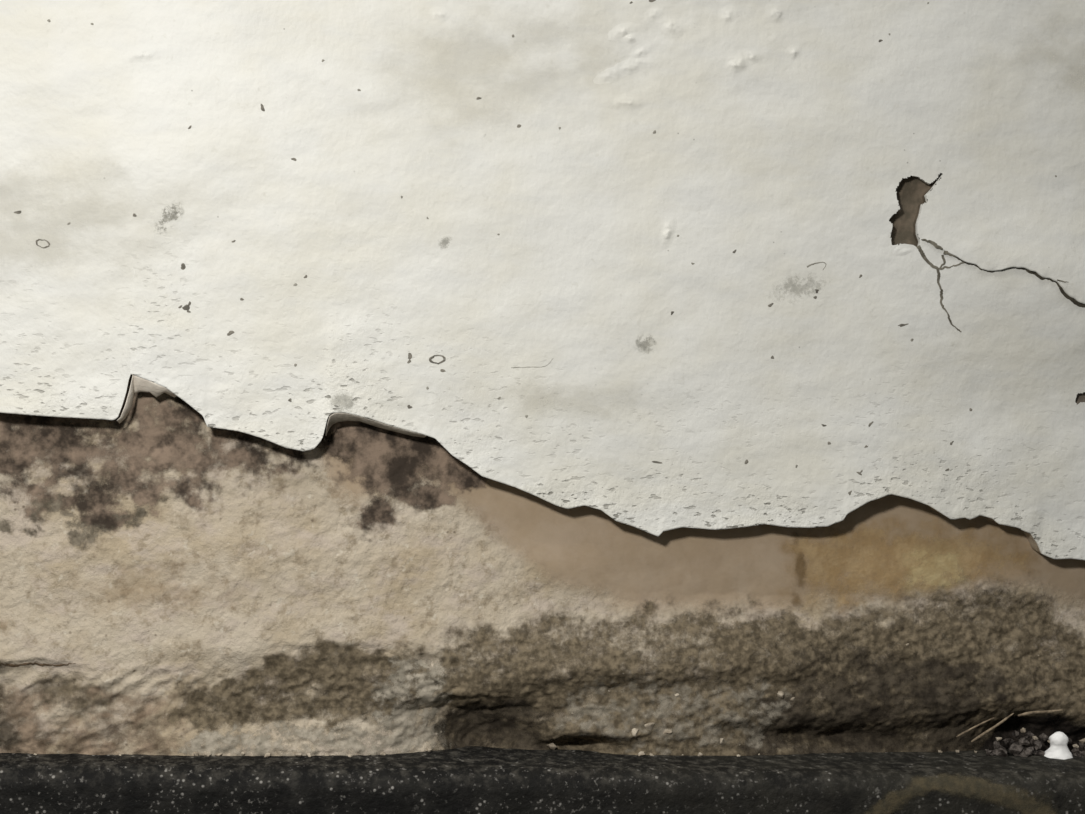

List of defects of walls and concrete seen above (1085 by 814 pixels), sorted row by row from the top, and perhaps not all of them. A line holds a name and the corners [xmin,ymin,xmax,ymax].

hole [889,173,943,256]
crack [916,239,1085,332]
mould [0,375,309,548]
flaking render [0,375,1085,756]
water stain [179,658,451,756]